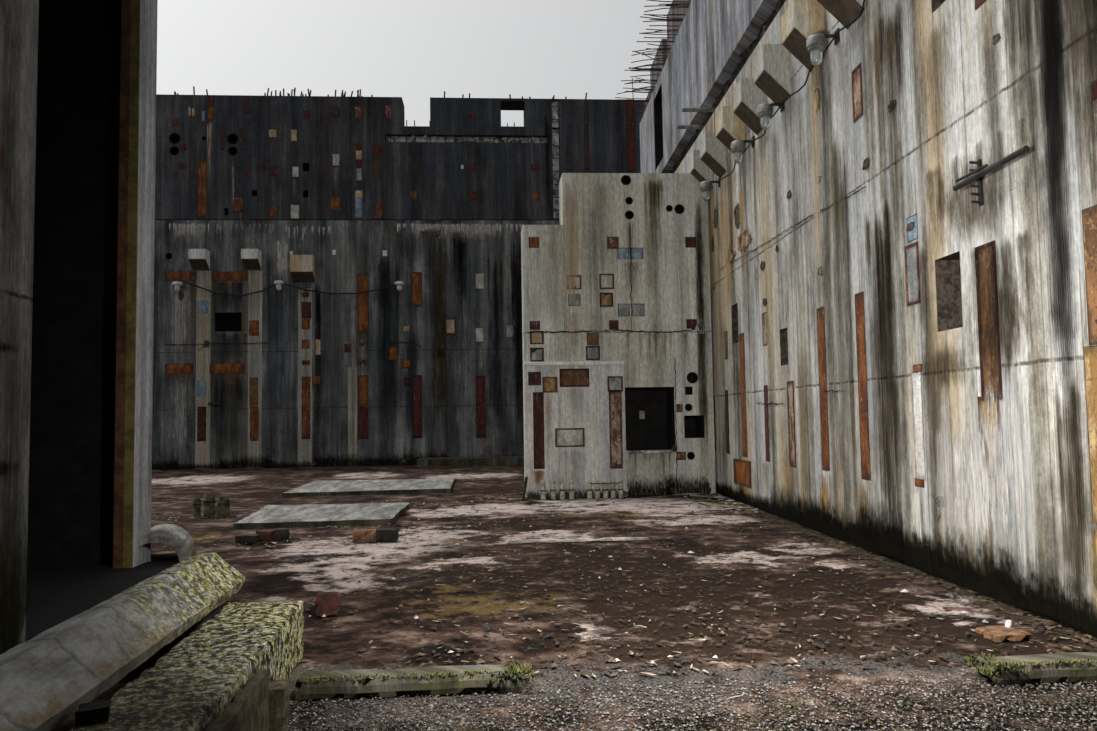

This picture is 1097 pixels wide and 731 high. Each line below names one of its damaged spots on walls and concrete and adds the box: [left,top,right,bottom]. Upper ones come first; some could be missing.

leakage [397,223,522,291]
leakage [480,250,555,416]
leakage [525,0,1097,637]